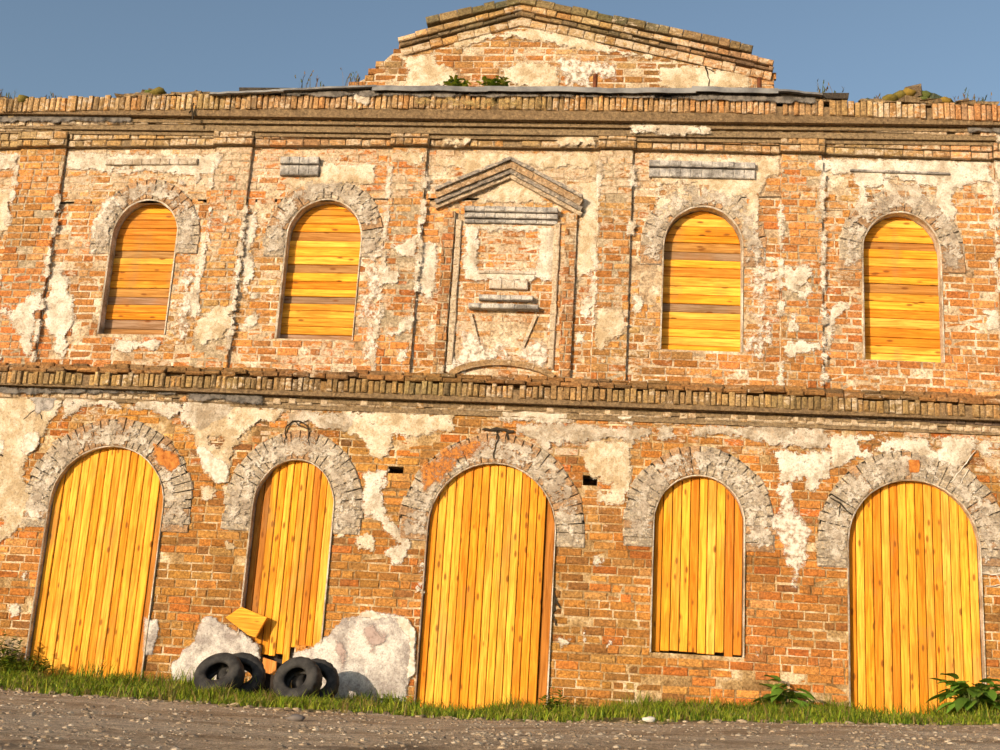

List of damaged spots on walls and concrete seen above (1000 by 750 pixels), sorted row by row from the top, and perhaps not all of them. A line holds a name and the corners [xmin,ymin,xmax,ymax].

peeling [397,52,458,86]
peeling [501,62,561,86]
peeling [454,28,653,59]
peeling [657,64,751,88]
peeling [0,152,21,171]
peeling [0,188,16,235]
peeling [0,218,76,364]
peeling [65,150,439,372]
peeling [399,136,644,351]
peeling [815,157,1000,269]
peeling [987,220,1000,292]
peeling [0,397,1000,572]